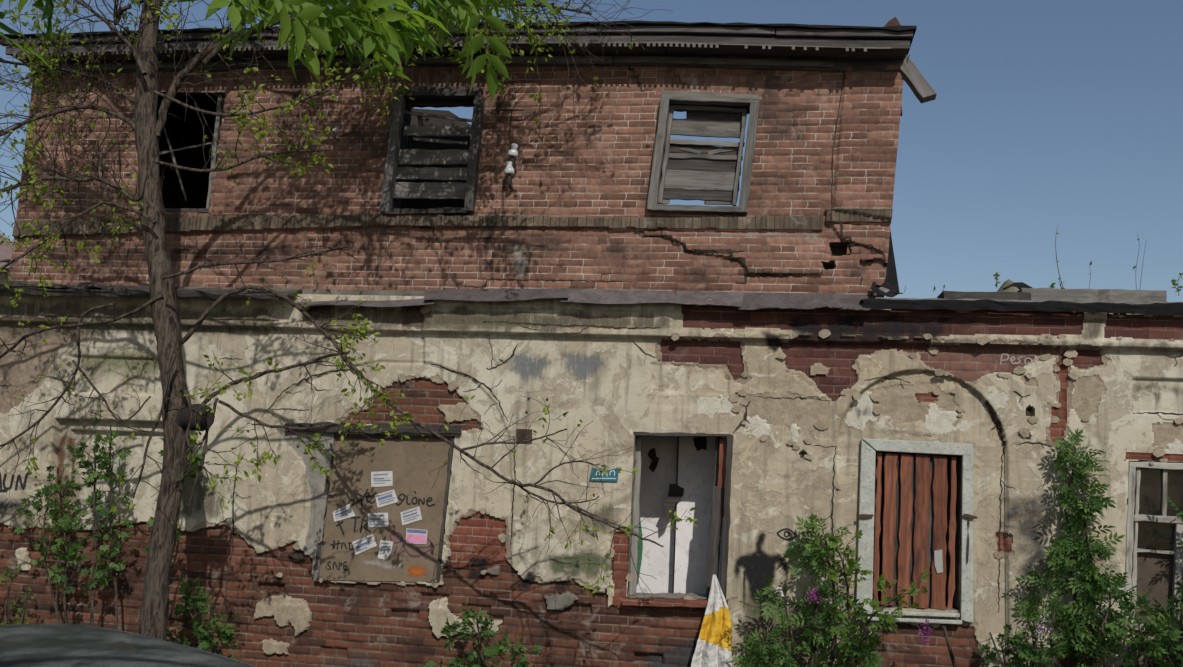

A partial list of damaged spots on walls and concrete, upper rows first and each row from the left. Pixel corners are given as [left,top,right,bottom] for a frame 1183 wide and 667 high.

crack [641,227,822,284]
crack [829,73,887,284]
flaking render [0,312,84,415]
flaking render [335,372,484,434]
flaking render [655,299,1183,465]
flaking render [0,517,154,634]
flaking render [166,509,713,667]
crack [984,390,1051,612]